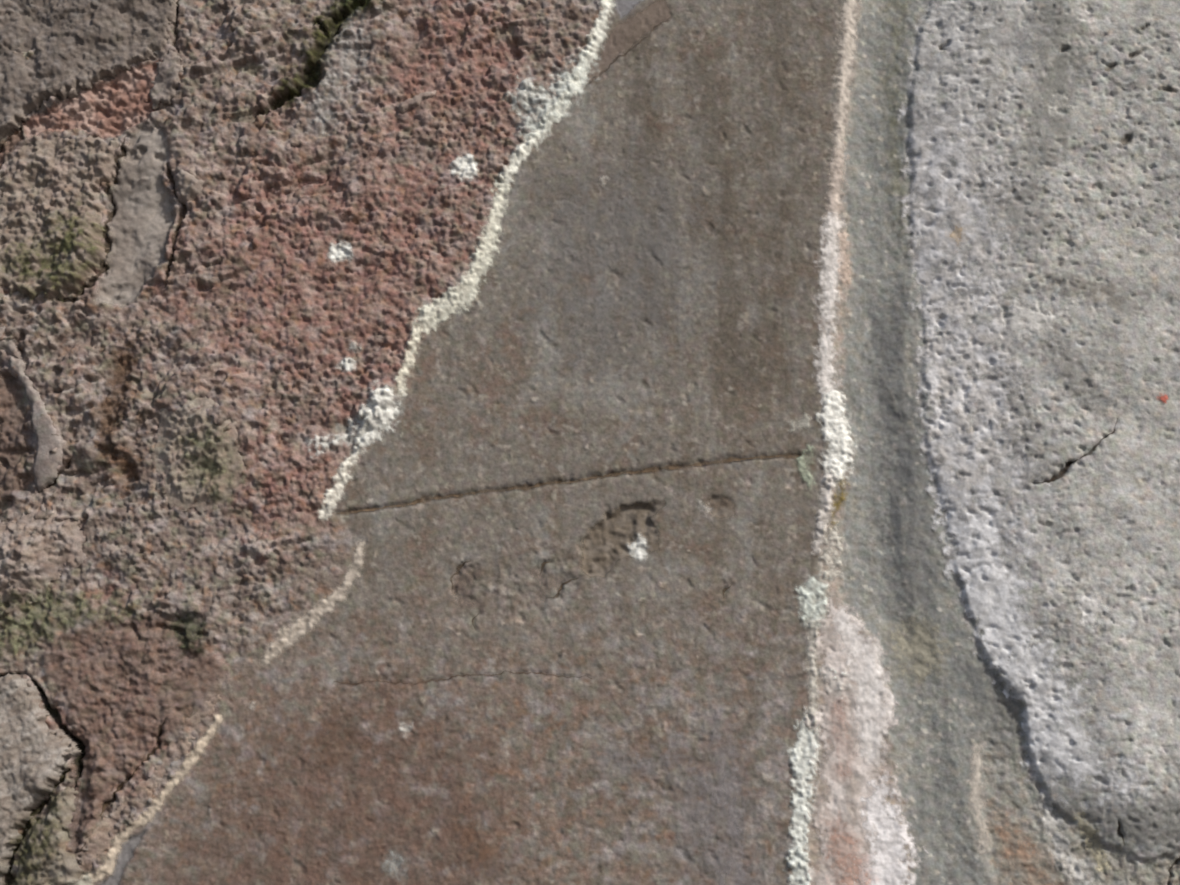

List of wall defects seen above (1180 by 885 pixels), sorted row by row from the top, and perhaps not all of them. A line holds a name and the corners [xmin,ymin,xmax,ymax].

crack [172,0,180,52]
crack [254,0,370,122]
damp [280,0,369,133]
crack [53,136,127,303]
crack [164,164,187,287]
damp [308,0,614,519]
crack [337,454,806,514]
damp [788,0,944,885]
crack [1039,419,1118,483]
crack [0,673,86,885]
crack [80,720,165,852]
crack [1168,857,1180,885]